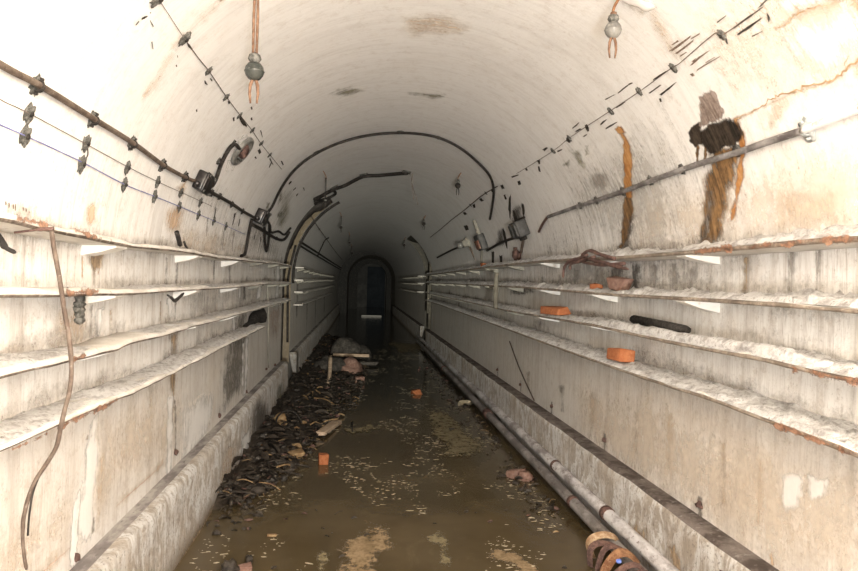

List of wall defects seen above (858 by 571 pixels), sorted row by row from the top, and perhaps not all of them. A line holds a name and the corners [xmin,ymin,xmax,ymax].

crack [775,5,828,29]
crack [734,56,858,120]
rust [615,127,633,249]
rust [731,117,745,220]
water stain [223,315,249,406]
water stain [241,399,268,455]